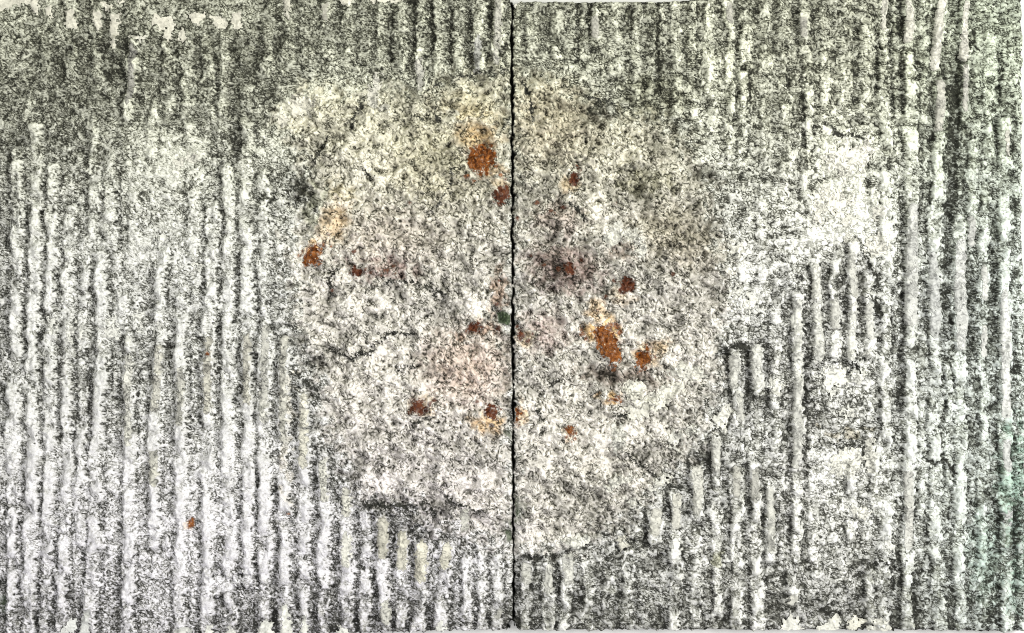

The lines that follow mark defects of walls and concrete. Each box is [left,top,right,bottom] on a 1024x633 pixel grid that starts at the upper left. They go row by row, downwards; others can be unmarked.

rust [448,115,511,207]
rust [533,164,582,215]
rust [297,193,398,279]
rust [527,253,584,277]
rust [579,276,678,374]
rust [407,391,442,417]
rust [464,395,530,442]